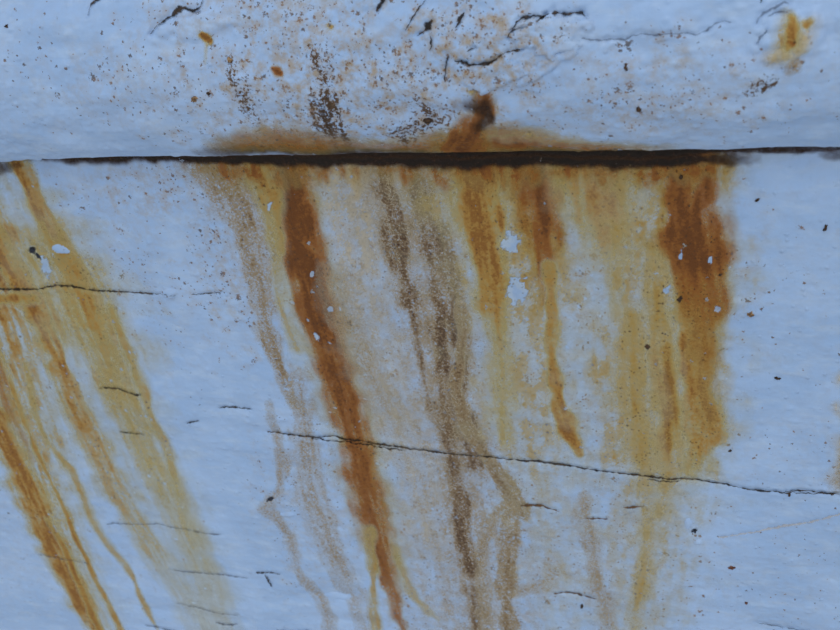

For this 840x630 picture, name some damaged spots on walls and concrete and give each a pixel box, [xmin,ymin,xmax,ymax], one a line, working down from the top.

rust [769,13,814,72]
rust [742,74,779,97]
crack [0,285,166,295]
rust [52,93,840,630]
rust [0,159,194,630]
crack [267,431,839,495]
crack [521,504,559,512]